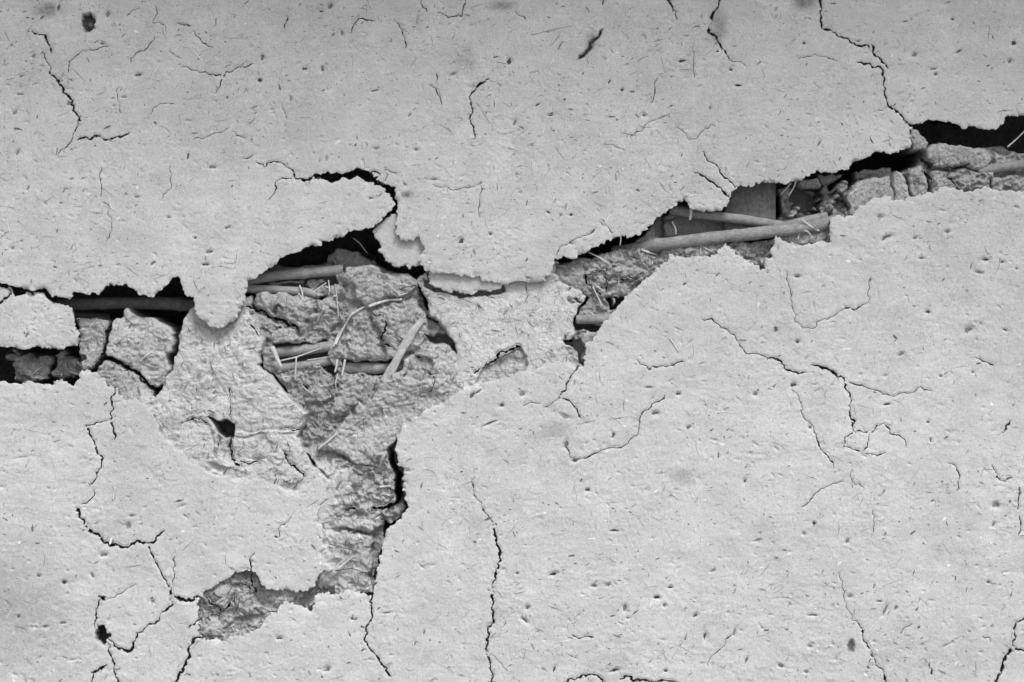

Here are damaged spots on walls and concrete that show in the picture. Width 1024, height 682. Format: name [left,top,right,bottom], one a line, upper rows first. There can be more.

crack [27,5,255,243]
crack [666,0,748,80]
crack [796,0,972,192]
spalling [776,115,1024,221]
crack [0,283,306,682]
spalling [0,199,830,642]
crack [470,481,509,682]
crack [563,358,685,462]
crack [700,316,933,540]